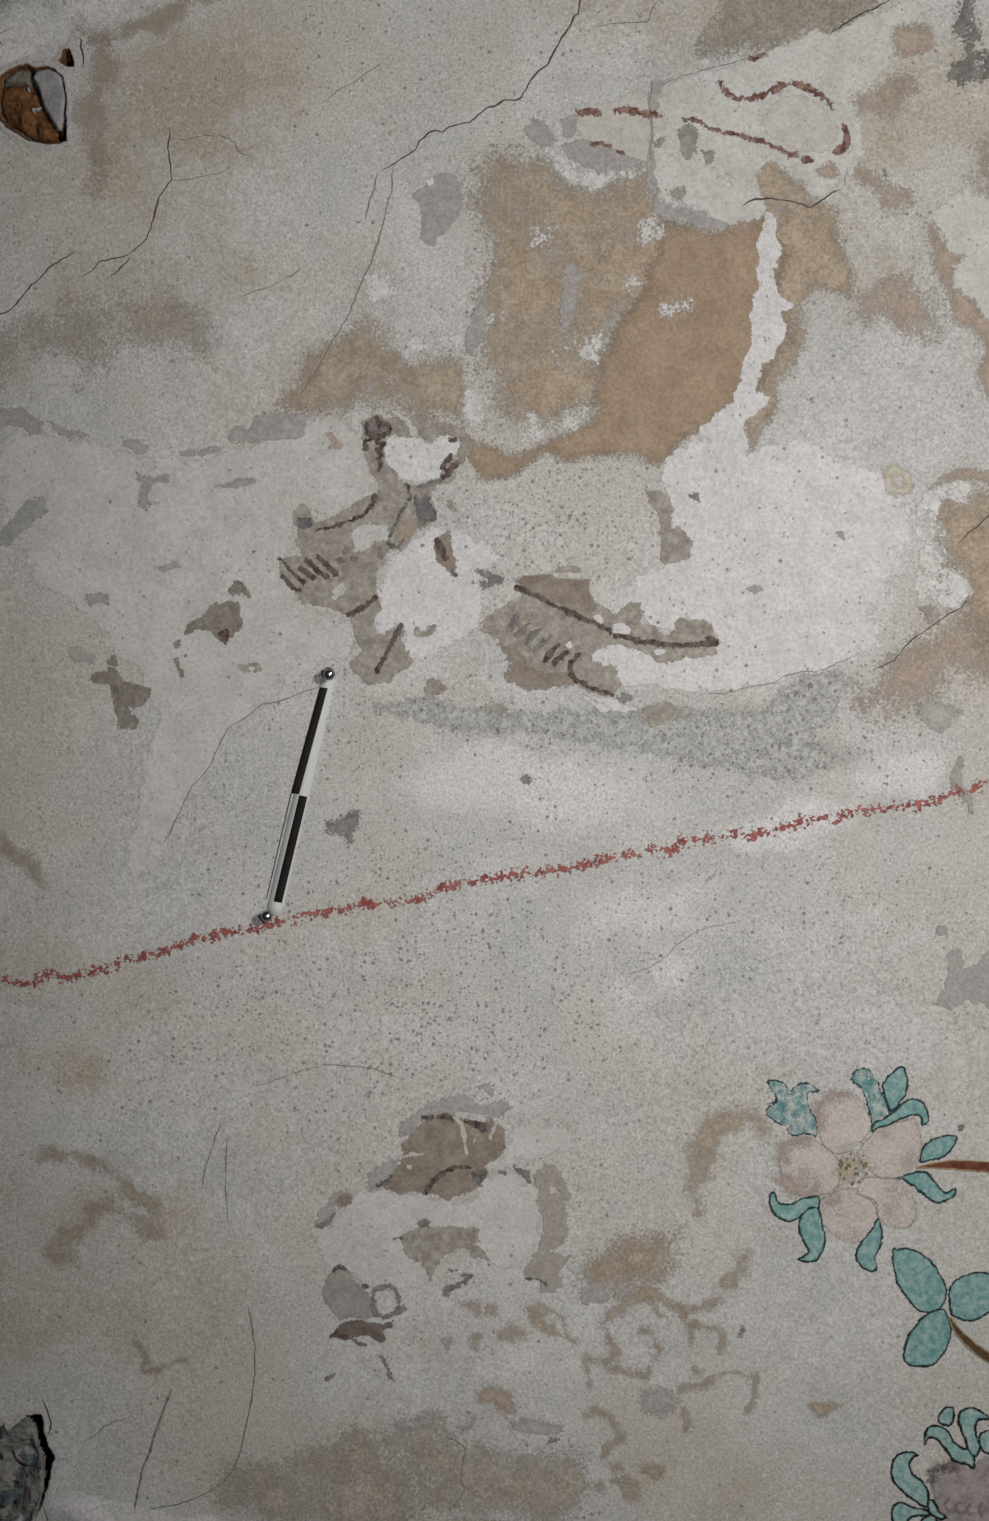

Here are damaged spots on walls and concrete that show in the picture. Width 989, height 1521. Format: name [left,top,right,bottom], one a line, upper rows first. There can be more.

spalling [0,43,79,153]
crack [0,126,249,314]
crack [300,0,654,395]
peeling [524,77,729,248]
peeling [173,580,251,678]
peeling [277,256,609,685]
peeling [475,565,719,728]
peeling [646,490,700,565]
crack [708,593,970,694]
peeling [915,480,974,625]
peeling [315,1082,572,1297]
spalling [0,1409,61,1521]